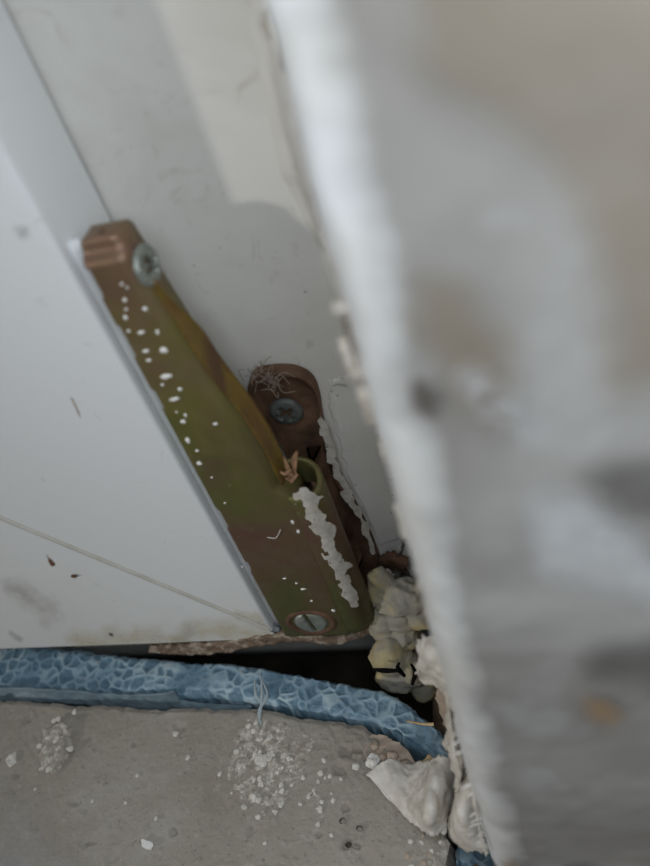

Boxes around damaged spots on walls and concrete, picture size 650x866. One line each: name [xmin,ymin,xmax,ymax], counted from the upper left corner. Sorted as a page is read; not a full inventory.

peeling [328,298,426,615]
peeling [352,633,489,866]